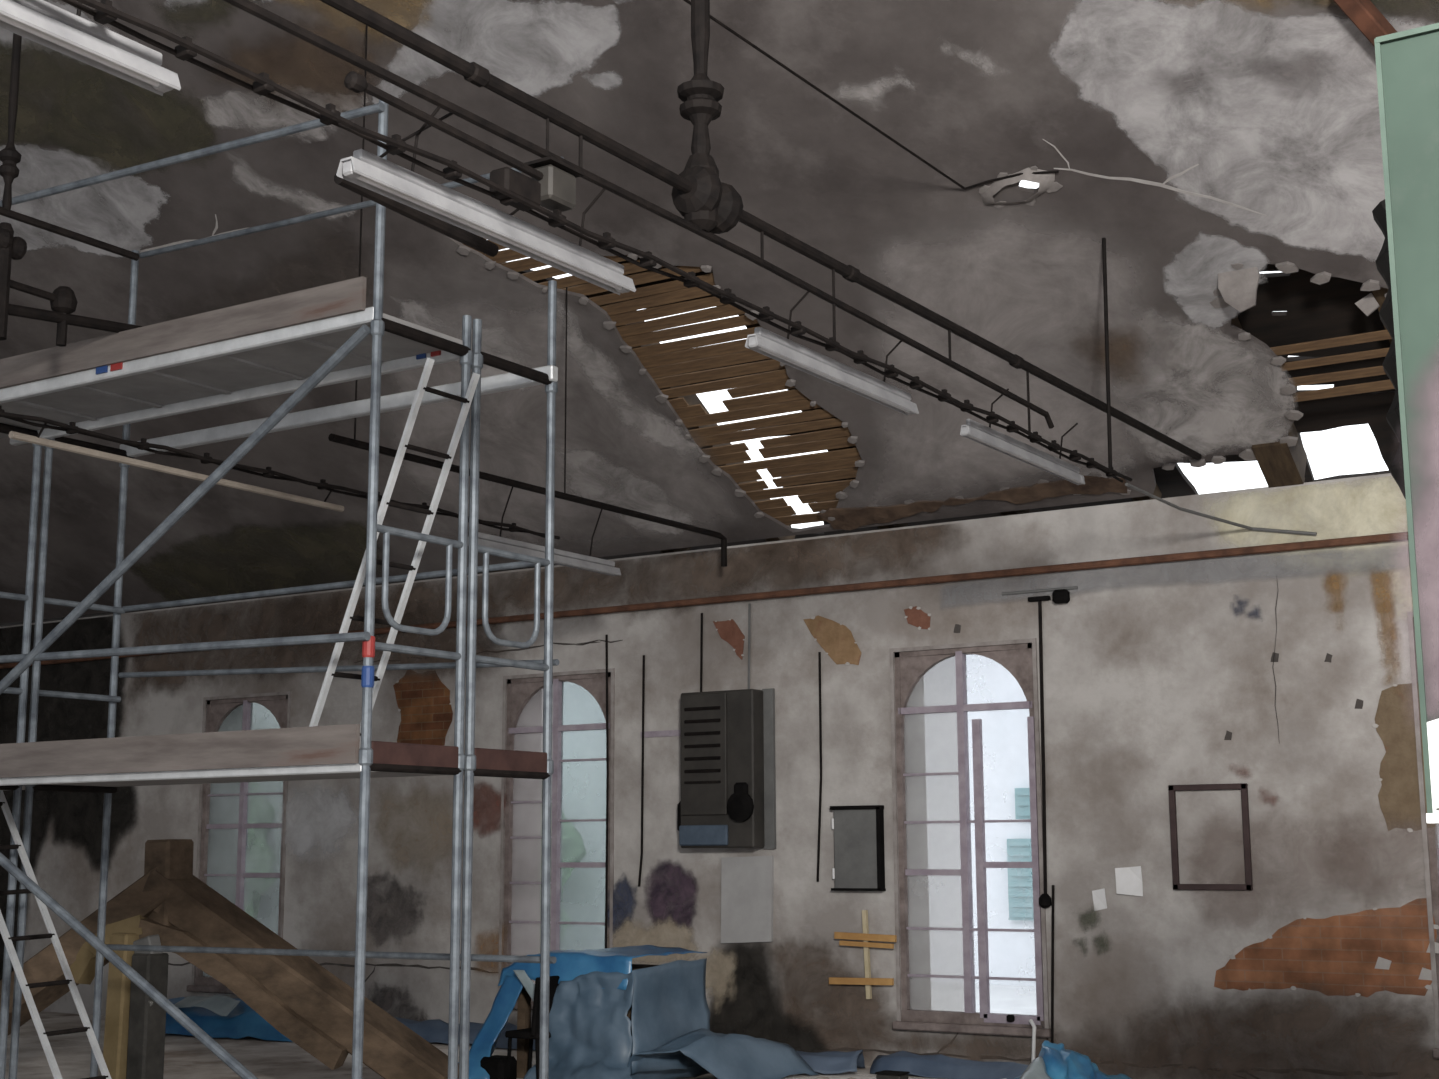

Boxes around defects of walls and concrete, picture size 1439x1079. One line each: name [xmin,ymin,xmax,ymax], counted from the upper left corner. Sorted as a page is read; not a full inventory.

peeling [202,0,622,140]
peeling [1390,20,1423,32]
peeling [0,144,169,257]
peeling [817,0,1387,530]
peeling [542,287,722,476]
peeling [559,450,691,535]
flaking render [803,615,861,665]
flaking render [393,670,453,746]
flaking render [1355,682,1436,832]
flaking render [1214,898,1439,997]